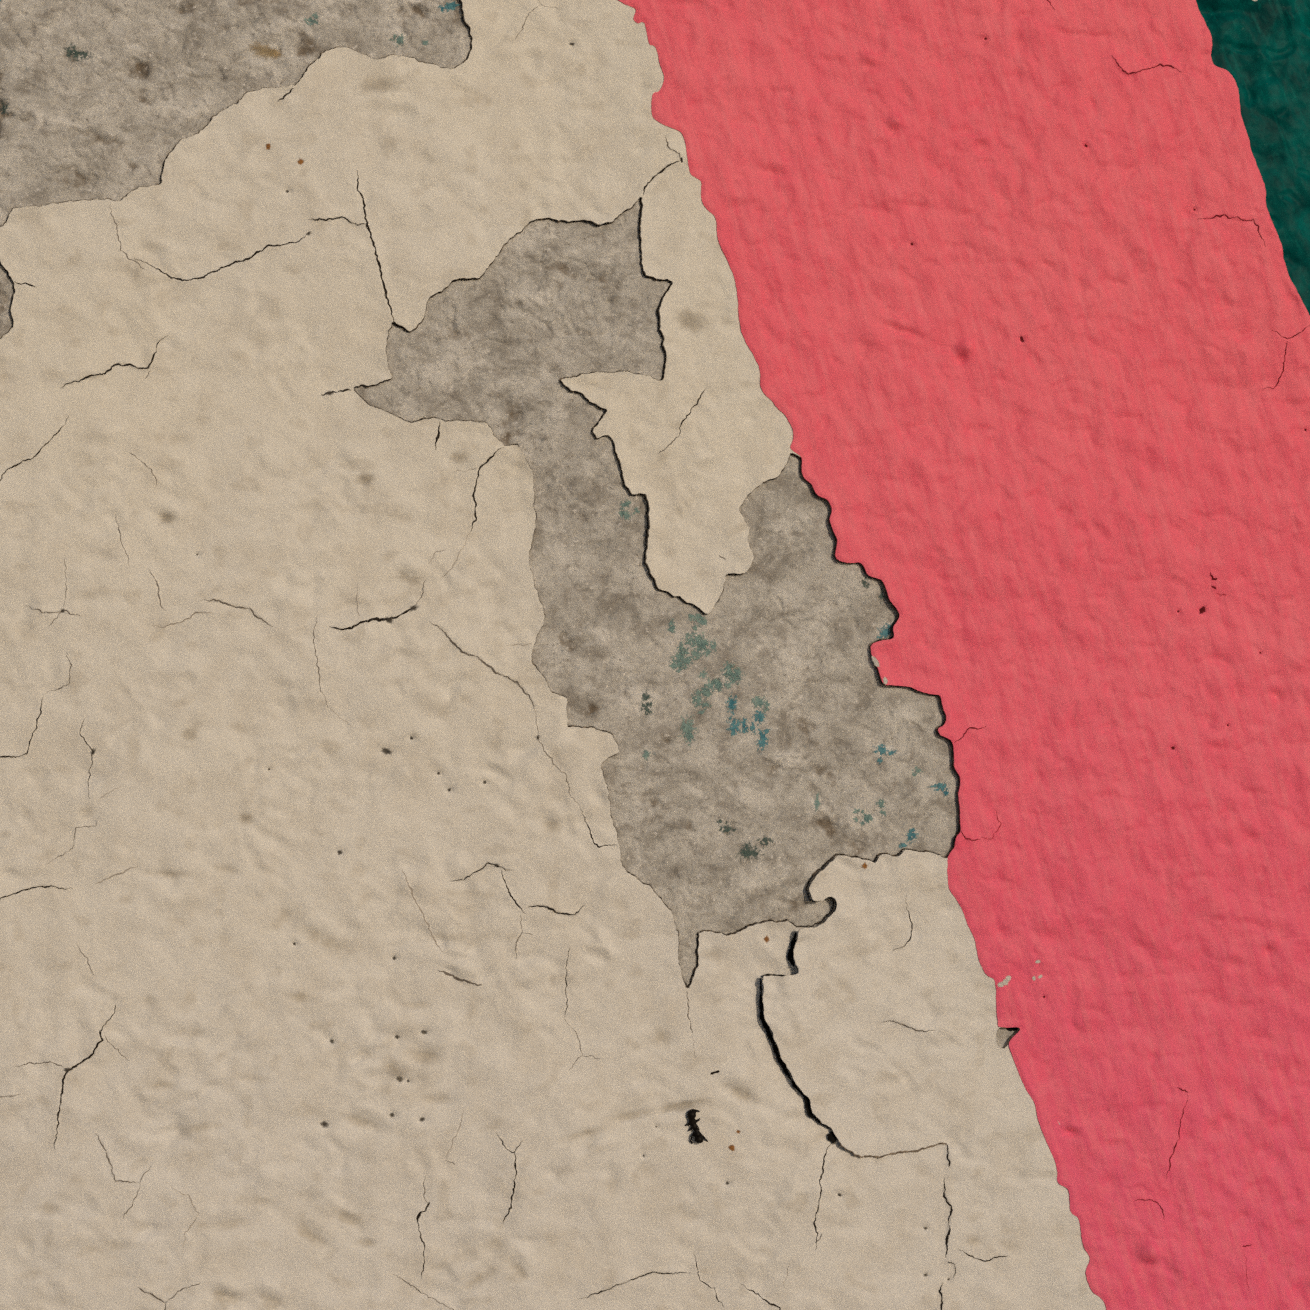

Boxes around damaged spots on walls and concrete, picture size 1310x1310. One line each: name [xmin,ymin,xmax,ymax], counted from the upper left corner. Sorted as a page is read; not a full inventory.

peeling [0,0,472,227]
peeling [0,262,15,339]
crack [110,171,394,322]
crack [0,335,169,481]
crack [313,447,612,848]
peeling [354,198,1041,1158]
crack [454,862,585,959]
crack [0,1006,129,1148]
crack [759,932,837,1248]
crack [497,1134,522,1223]
crack [581,1255,790,1310]
crack [939,1145,1007,1310]